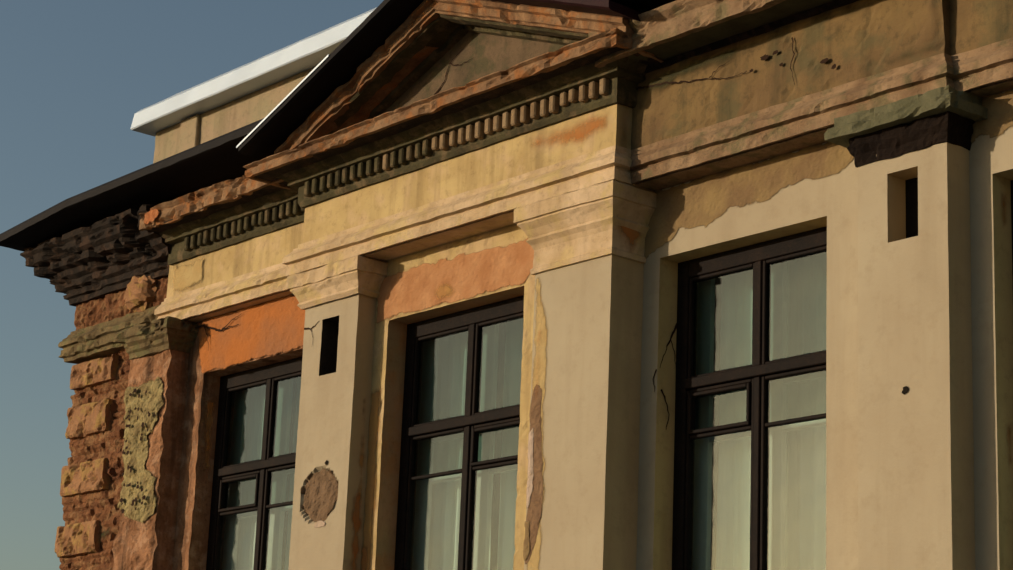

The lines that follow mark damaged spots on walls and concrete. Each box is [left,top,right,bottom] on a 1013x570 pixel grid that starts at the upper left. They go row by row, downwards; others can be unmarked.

crack [434,49,473,95]
crack [636,61,747,90]
flaking render [971,90,1013,143]
flaking render [144,209,159,224]
flaking render [644,142,853,258]
crack [195,313,242,347]
flaking render [376,238,547,570]
crack [653,323,677,429]
flaking render [117,377,164,524]
flaking render [300,460,338,528]